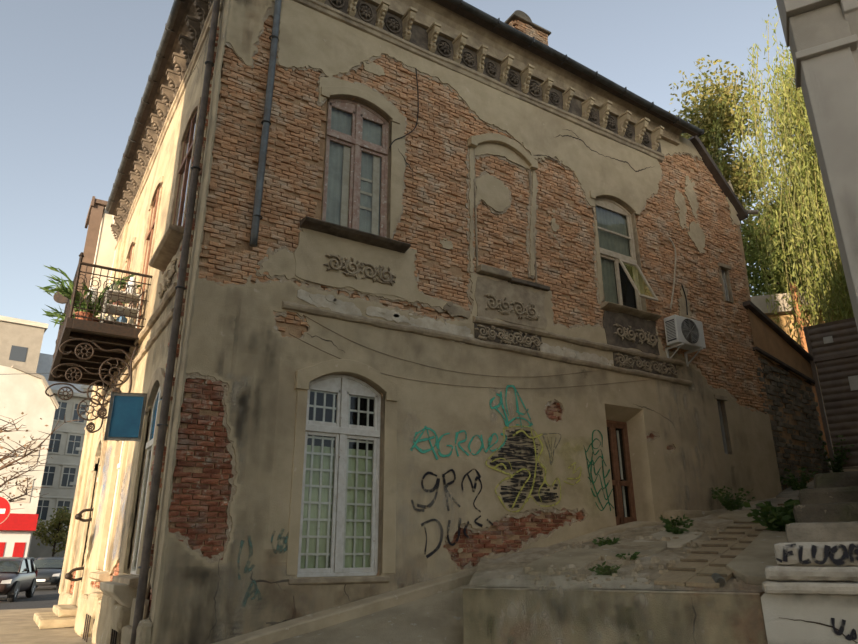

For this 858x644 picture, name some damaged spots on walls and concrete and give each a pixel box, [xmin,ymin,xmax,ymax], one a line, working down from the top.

flaking render [146,363,233,560]
flaking render [168,9,327,357]
flaking render [294,55,616,344]
flaking render [443,508,585,569]
flaking render [545,402,562,422]
peeling [540,343,614,366]
crack [534,129,650,172]
flaking render [636,154,769,413]